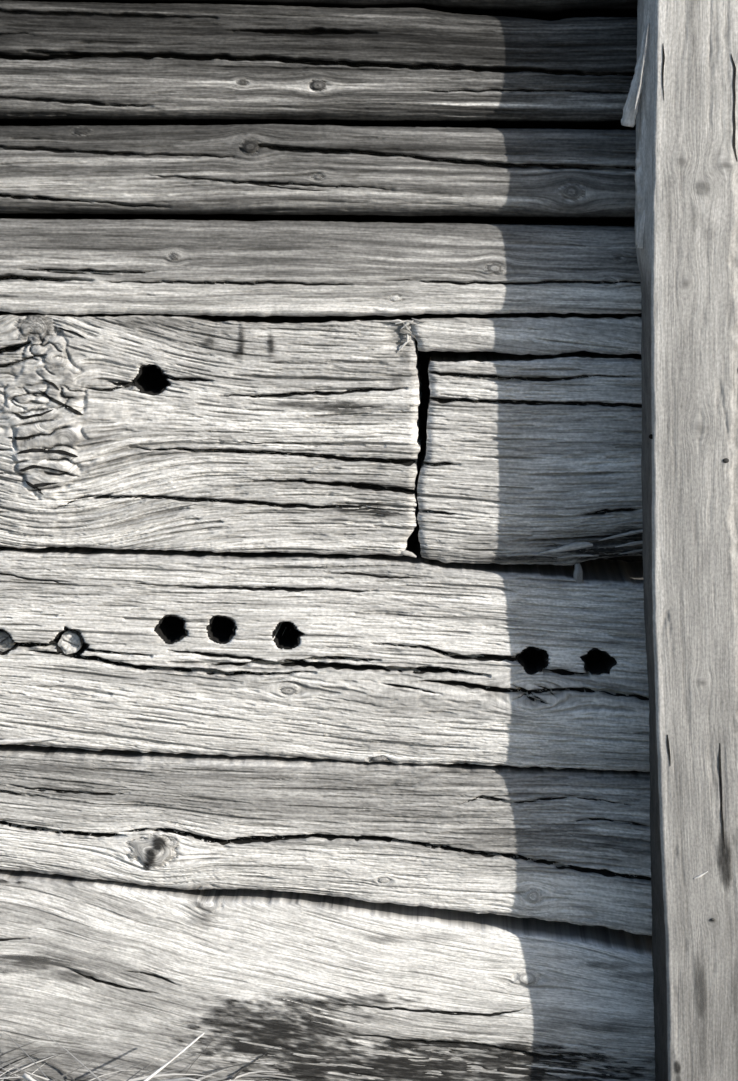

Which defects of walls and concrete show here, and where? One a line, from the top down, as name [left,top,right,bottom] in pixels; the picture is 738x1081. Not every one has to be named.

crack [730,54,738,162]
crack [55,327,85,338]
crack [428,371,642,408]
crack [0,342,459,515]
crack [585,507,640,515]
crack [19,642,649,704]
crack [0,785,124,797]
crack [462,795,645,826]
crack [718,743,726,844]
crack [0,821,651,880]